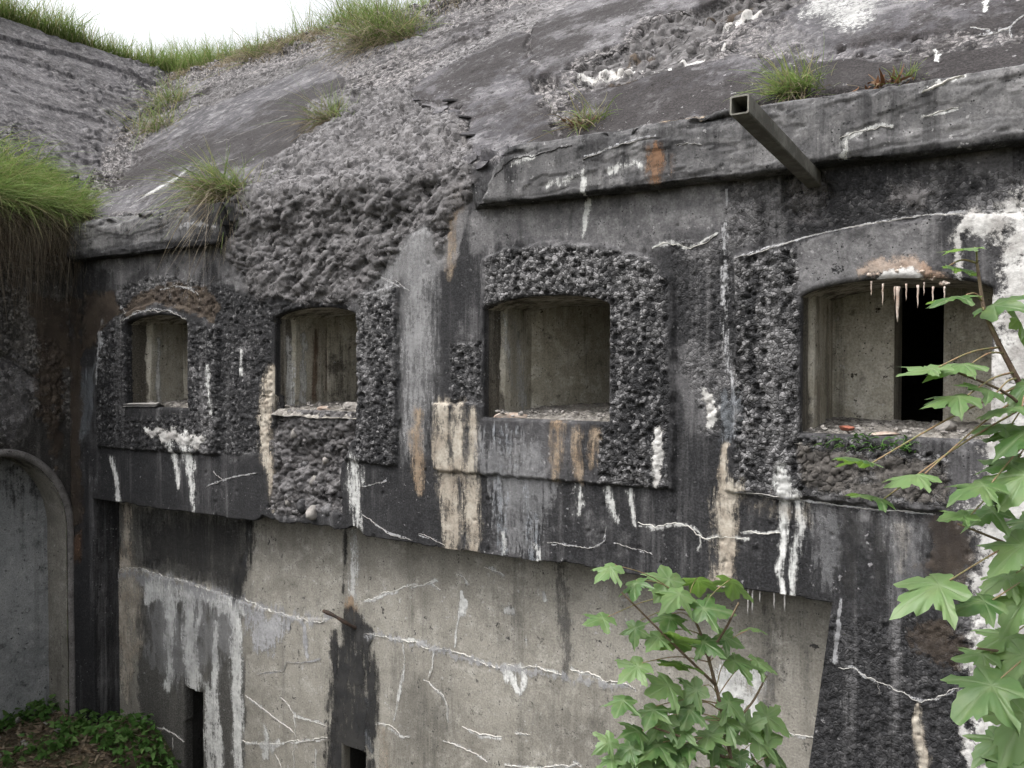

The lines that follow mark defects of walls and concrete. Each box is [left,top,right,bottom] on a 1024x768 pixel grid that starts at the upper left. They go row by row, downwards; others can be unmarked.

rust [646,141,672,187]
crack [734,208,1004,259]
water stain [720,222,729,311]
crack [551,522,779,554]
water stain [773,463,806,596]
crack [119,567,329,623]
water stain [109,420,628,768]
crack [364,566,505,602]
crack [370,632,635,768]
crack [838,665,959,703]